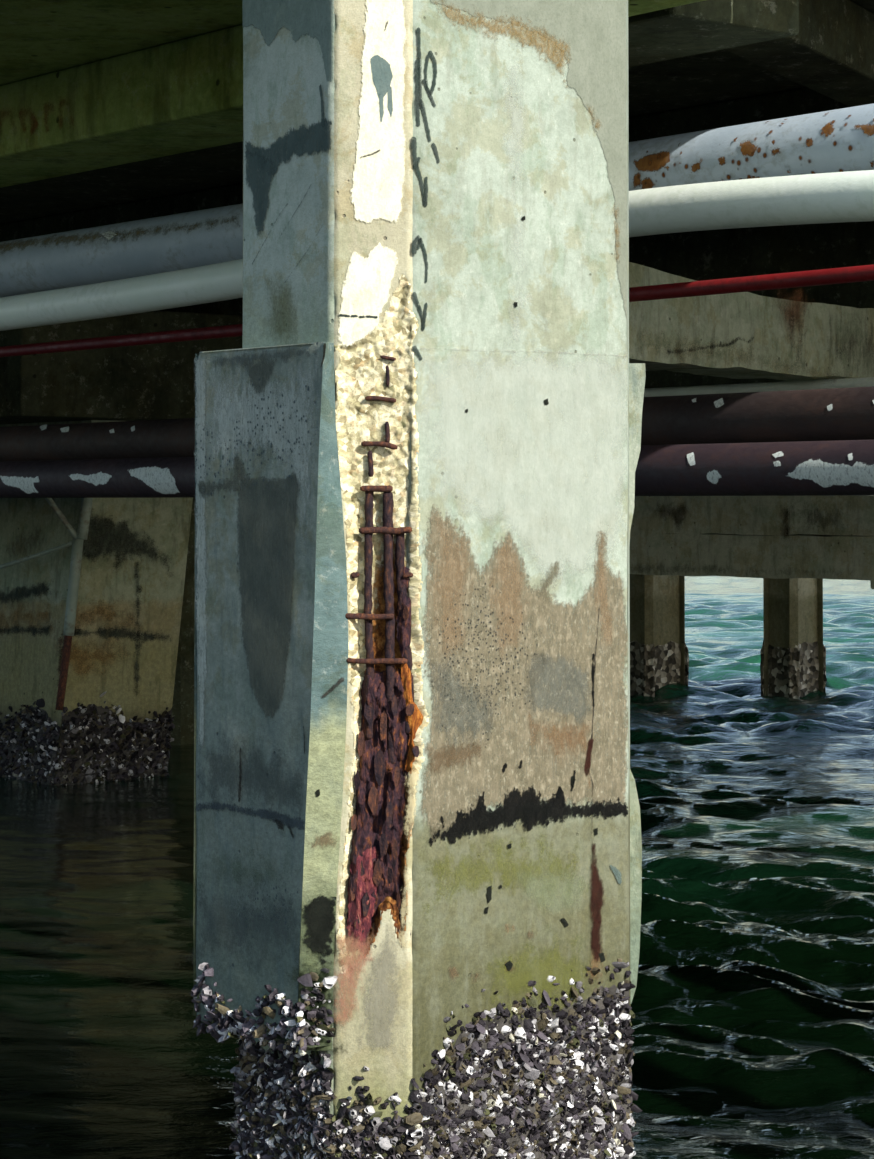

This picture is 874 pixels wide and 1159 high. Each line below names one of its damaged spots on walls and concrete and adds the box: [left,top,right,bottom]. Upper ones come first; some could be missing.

damp [245,85,332,235]
peeling [351,0,406,223]
peeling [430,0,627,317]
rust [633,143,702,189]
rust [716,119,787,182]
rust [787,112,874,175]
damp [75,509,170,575]
damp [192,350,316,718]
spalling [302,242,430,1047]
damp [416,358,628,837]
peeling [772,451,874,488]
rust [590,844,604,967]